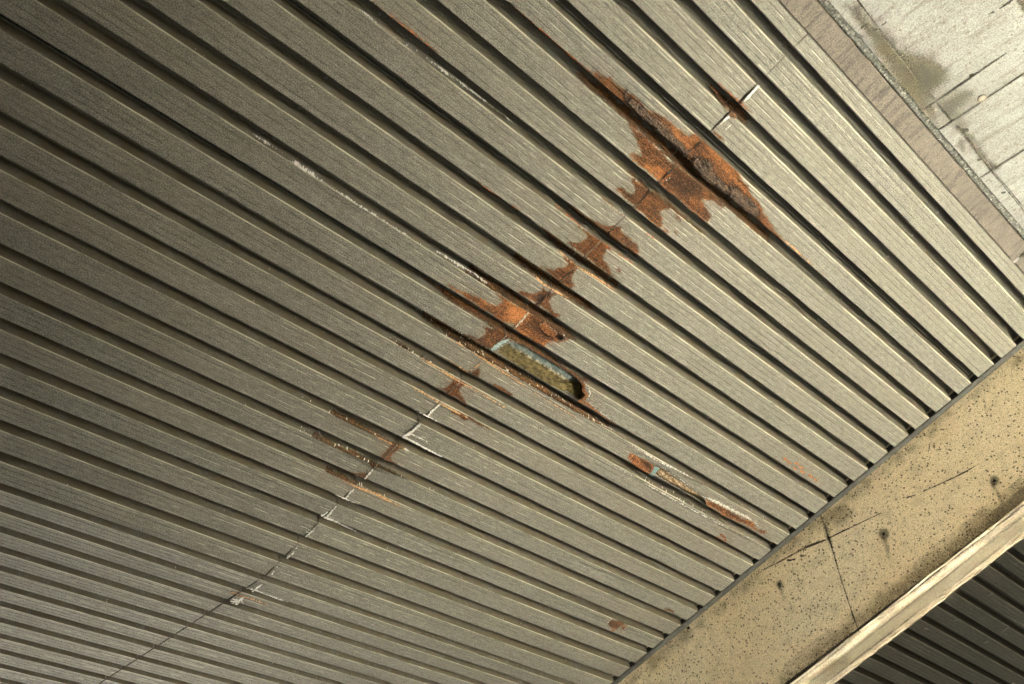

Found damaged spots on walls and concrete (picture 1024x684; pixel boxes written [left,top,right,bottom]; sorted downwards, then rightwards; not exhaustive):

rust [396,4,809,430]
spalling [498,335,585,399]
rust [300,408,407,508]
rust [706,500,766,534]
crack [906,466,975,498]
crack [762,513,881,627]